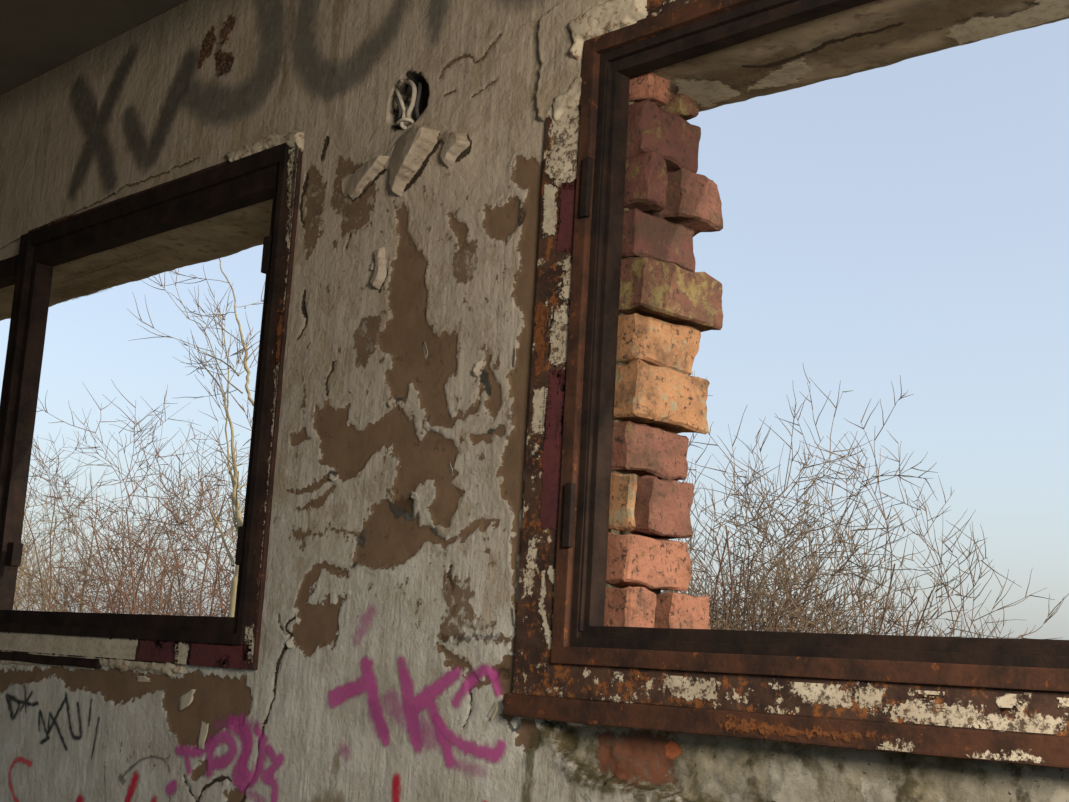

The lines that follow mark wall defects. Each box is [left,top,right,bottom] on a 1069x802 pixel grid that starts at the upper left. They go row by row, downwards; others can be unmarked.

damp [689,0,1009,89]
flaking render [226,0,1069,802]
peeling [0,624,254,802]
damp [522,721,705,802]